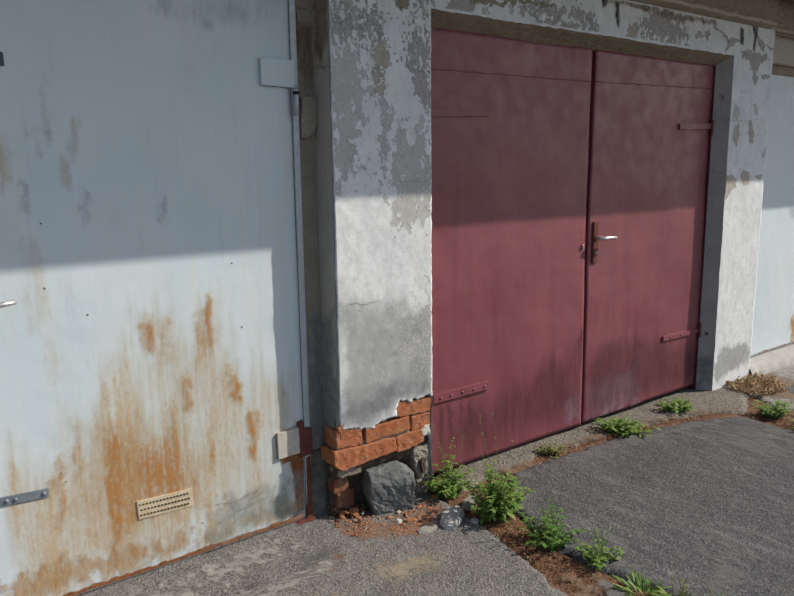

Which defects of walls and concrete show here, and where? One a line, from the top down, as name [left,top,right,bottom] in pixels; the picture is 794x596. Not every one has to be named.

peeling [509,0,600,32]
peeling [626,5,774,84]
peeling [330,0,436,239]
peeling [732,104,758,146]
peeling [725,170,763,200]
corrosion [140,322,154,351]
corrosion [198,299,212,353]
corrosion [212,370,242,414]
damp [309,306,430,438]
spalling [320,303,432,517]
damp [699,344,749,381]
corrosion [13,398,313,596]